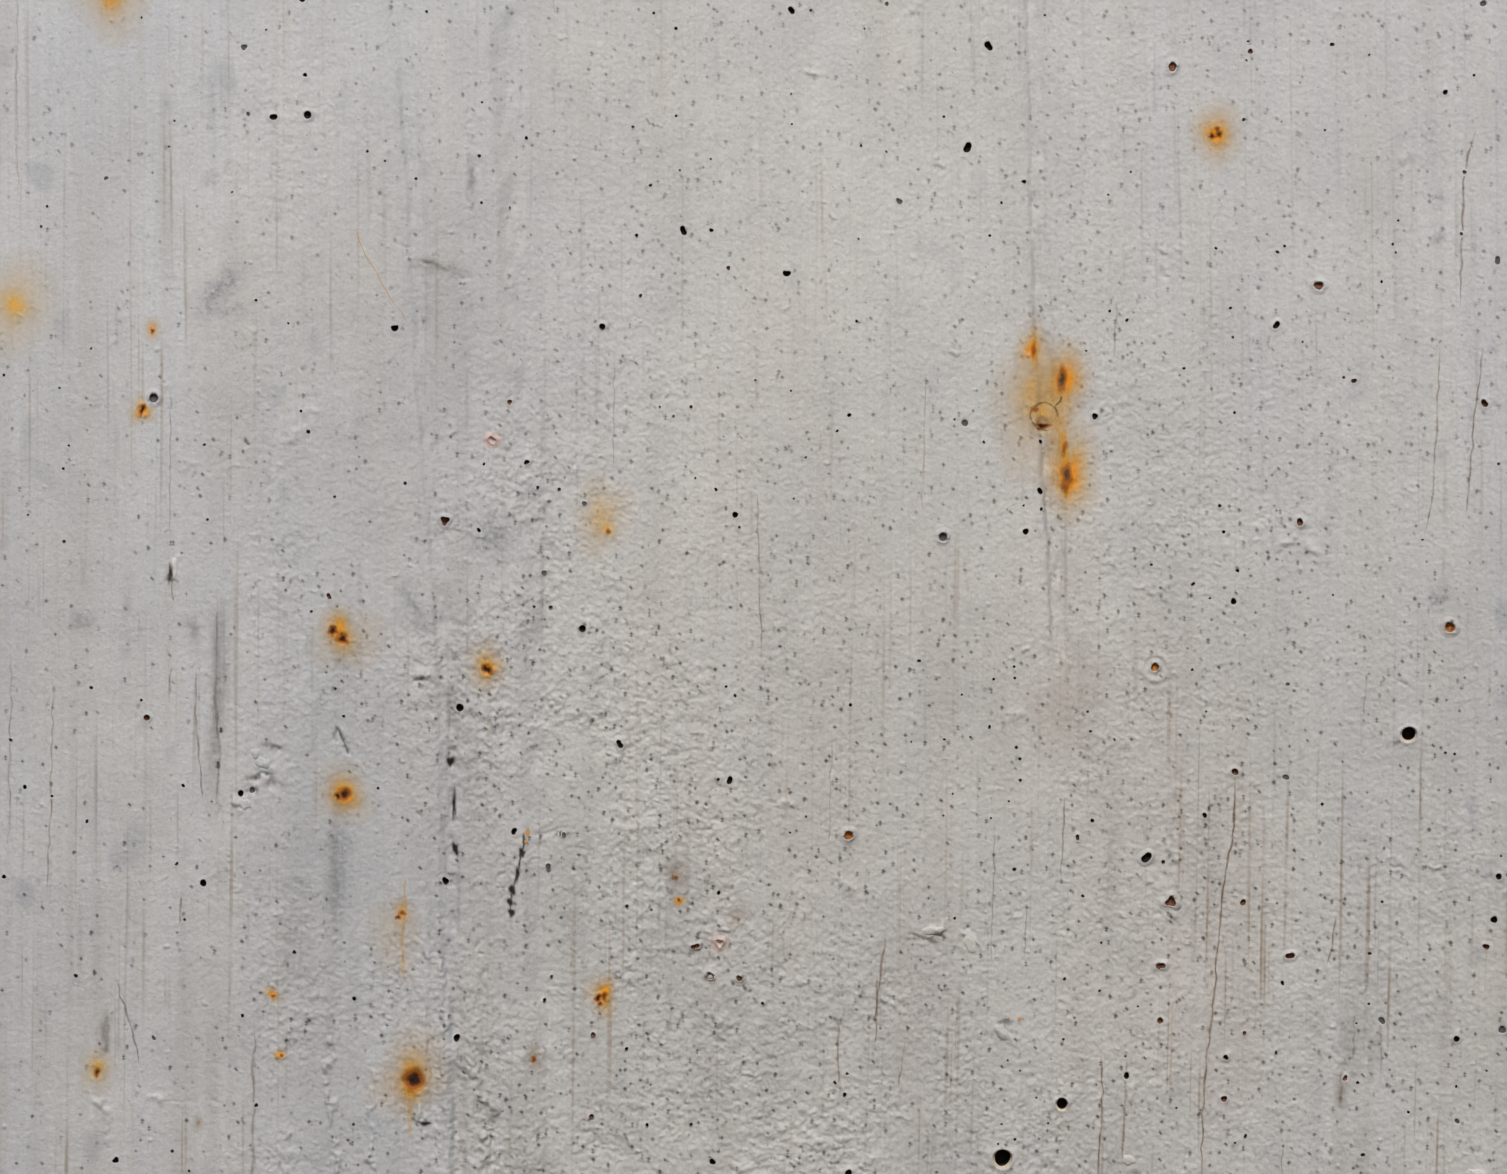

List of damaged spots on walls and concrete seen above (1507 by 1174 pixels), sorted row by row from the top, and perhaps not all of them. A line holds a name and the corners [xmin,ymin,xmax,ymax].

rust [1207,124,1225,144]
rust [1025,336,1038,362]
rust [136,403,149,417]
rust [1030,362,1083,497]
rust [328,620,348,645]
rust [482,663,494,675]
rust [334,784,354,803]
rust [595,986,609,1006]
rust [403,1064,424,1095]